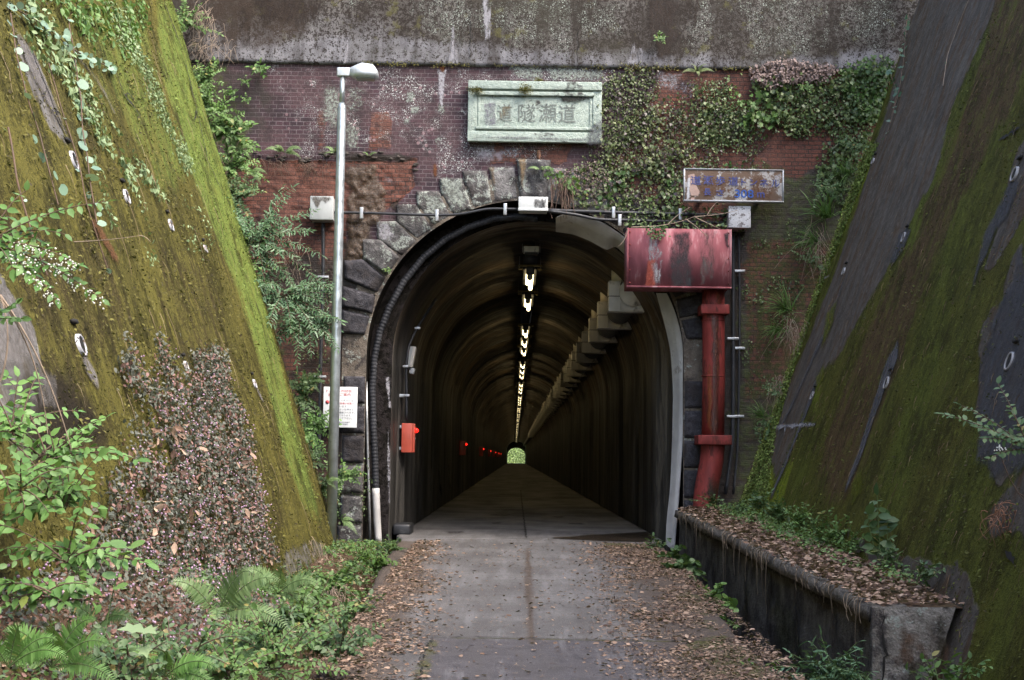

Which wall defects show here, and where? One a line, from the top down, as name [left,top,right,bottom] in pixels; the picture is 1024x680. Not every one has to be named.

efflorescence [483,0,491,39]
rust [708,317,720,435]